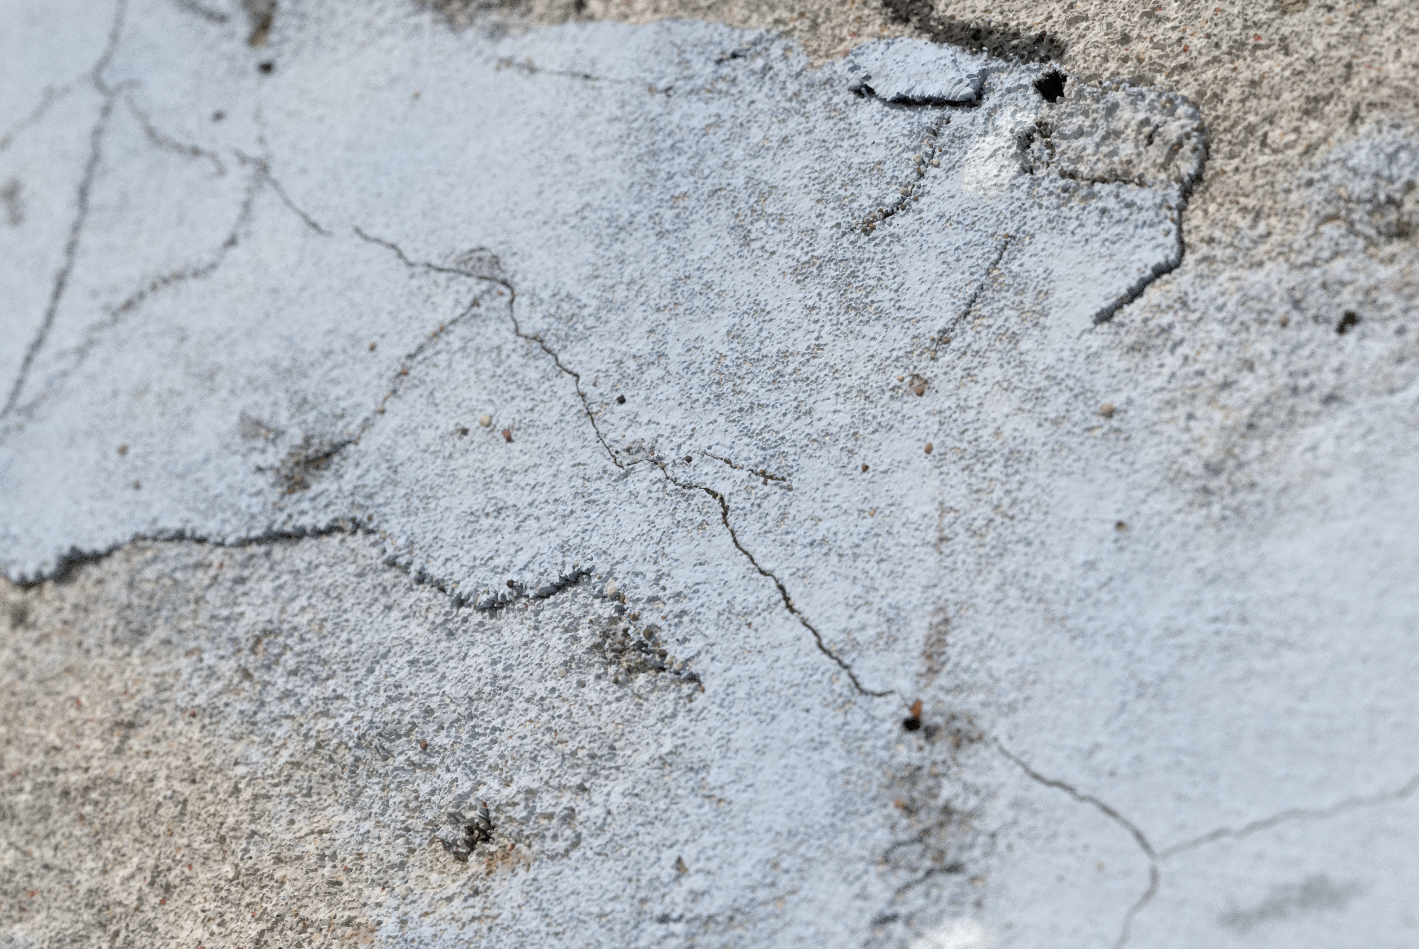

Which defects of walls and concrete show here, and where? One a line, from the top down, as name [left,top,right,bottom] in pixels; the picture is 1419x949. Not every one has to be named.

hole [245,11,275,78]
crack [841,81,987,234]
crack [1033,114,1193,194]
crack [1091,77,1142,105]
crack [0,0,911,715]
flaking render [412,0,1419,543]
crack [929,229,1019,359]
flaking render [0,511,705,949]
spalling [902,716,922,735]
crack [432,814,496,854]
crack [921,731,1419,949]